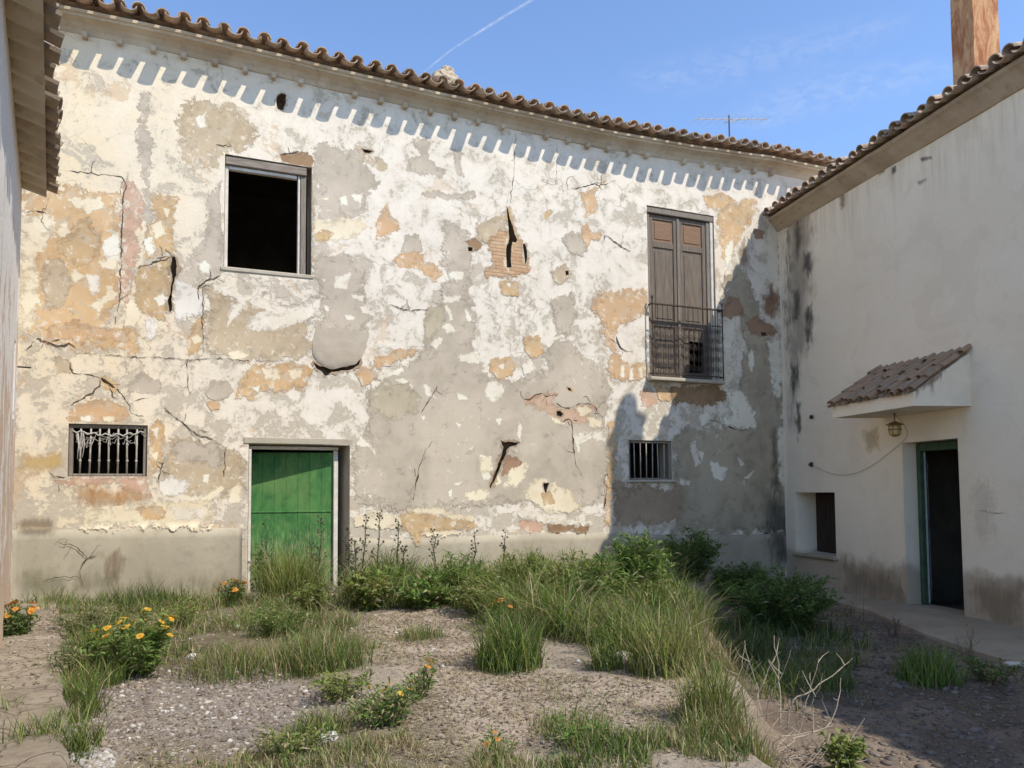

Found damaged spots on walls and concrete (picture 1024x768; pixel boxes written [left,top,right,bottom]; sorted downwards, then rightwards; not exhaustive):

damp [796,221,811,273]
crack [27,161,286,473]
peeling [18,91,785,546]
damp [794,292,812,341]
crack [407,443,431,500]
crack [489,439,520,488]